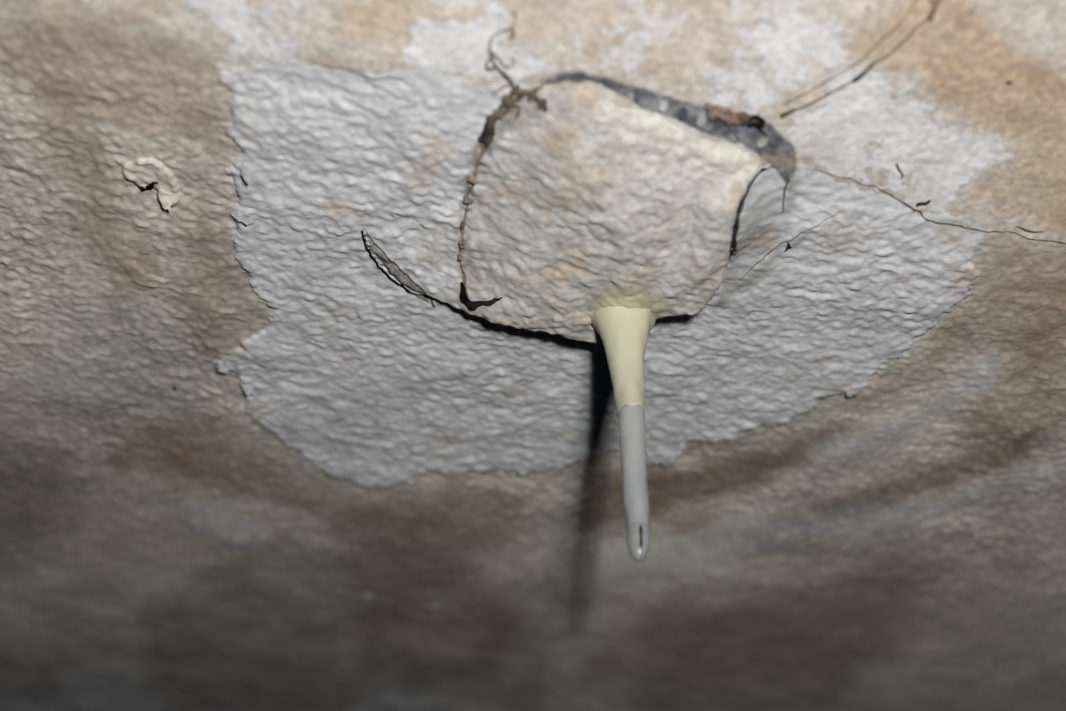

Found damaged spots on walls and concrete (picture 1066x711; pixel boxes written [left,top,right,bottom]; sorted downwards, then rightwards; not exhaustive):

leakage [972,48,1032,94]
spalling [121,157,180,212]
crack [361,141,503,311]
peeling [182,0,1016,487]
crack [729,163,1066,280]
leakage [607,484,624,514]
leakage [647,471,722,511]